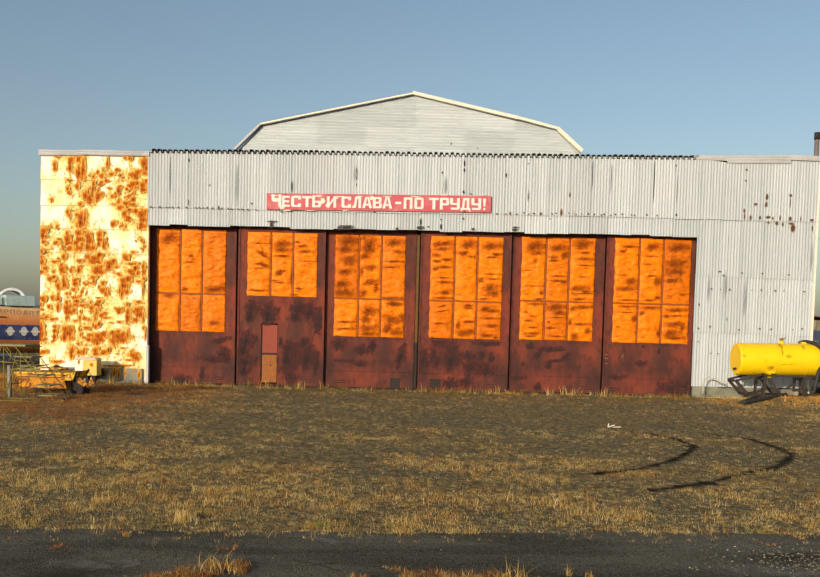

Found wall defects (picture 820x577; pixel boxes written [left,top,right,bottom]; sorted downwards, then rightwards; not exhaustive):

corrosion [40,155,257,380]
corrosion [743,194,814,232]